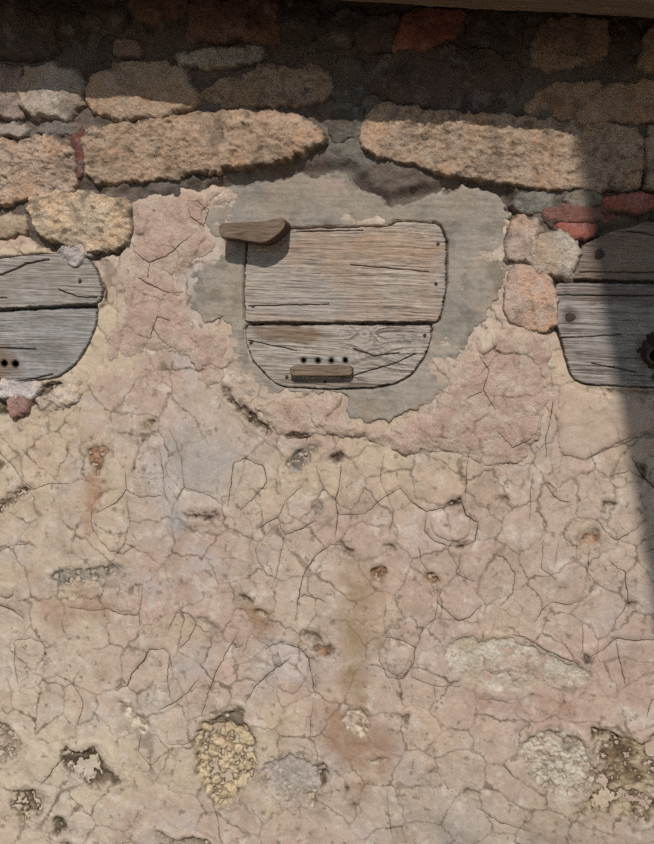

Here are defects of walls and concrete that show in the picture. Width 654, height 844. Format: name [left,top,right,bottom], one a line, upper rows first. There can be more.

crack [135,200,209,295]
crack [91,430,267,553]
crack [259,489,316,574]
crack [295,449,478,618]
crack [116,612,236,715]
crack [245,643,316,738]
crack [378,608,460,698]
crack [513,563,654,684]
spalling [0,721,23,766]
spalling [9,788,46,828]
spalling [59,744,126,792]
spalling [191,705,324,811]